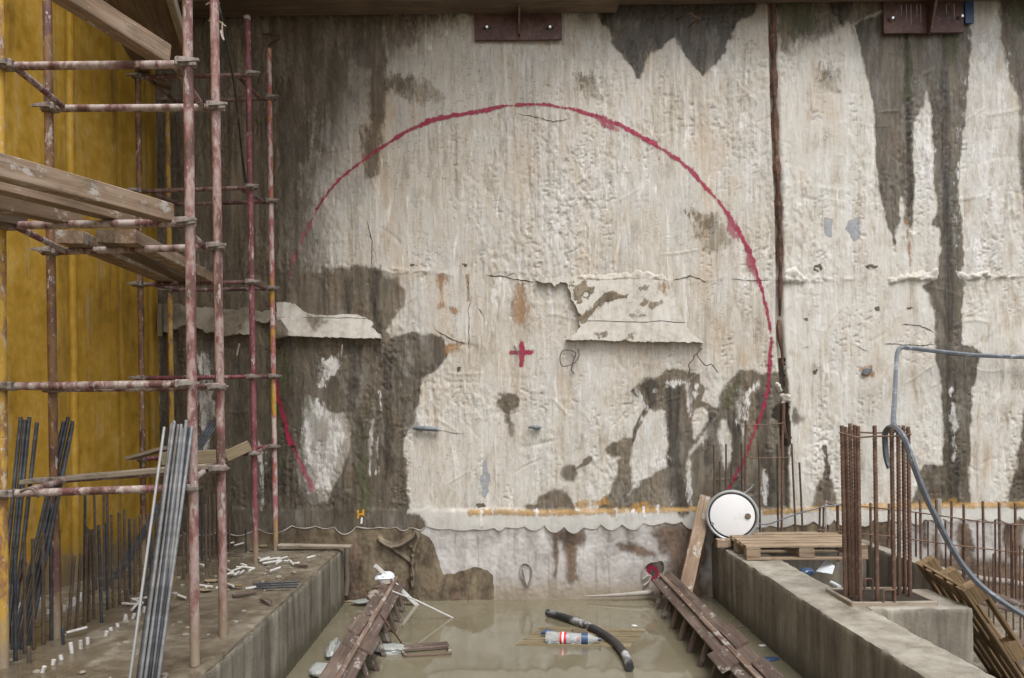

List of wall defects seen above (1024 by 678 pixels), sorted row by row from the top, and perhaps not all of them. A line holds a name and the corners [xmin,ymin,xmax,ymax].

leakage [599,3,757,78]
leakage [775,0,1024,506]
peeling [162,302,382,339]
leakage [155,14,494,601]
crack [436,273,536,345]
corrosion [511,284,530,324]
peeling [536,277,704,344]
leakage [515,369,801,582]
leakage [693,538,707,597]